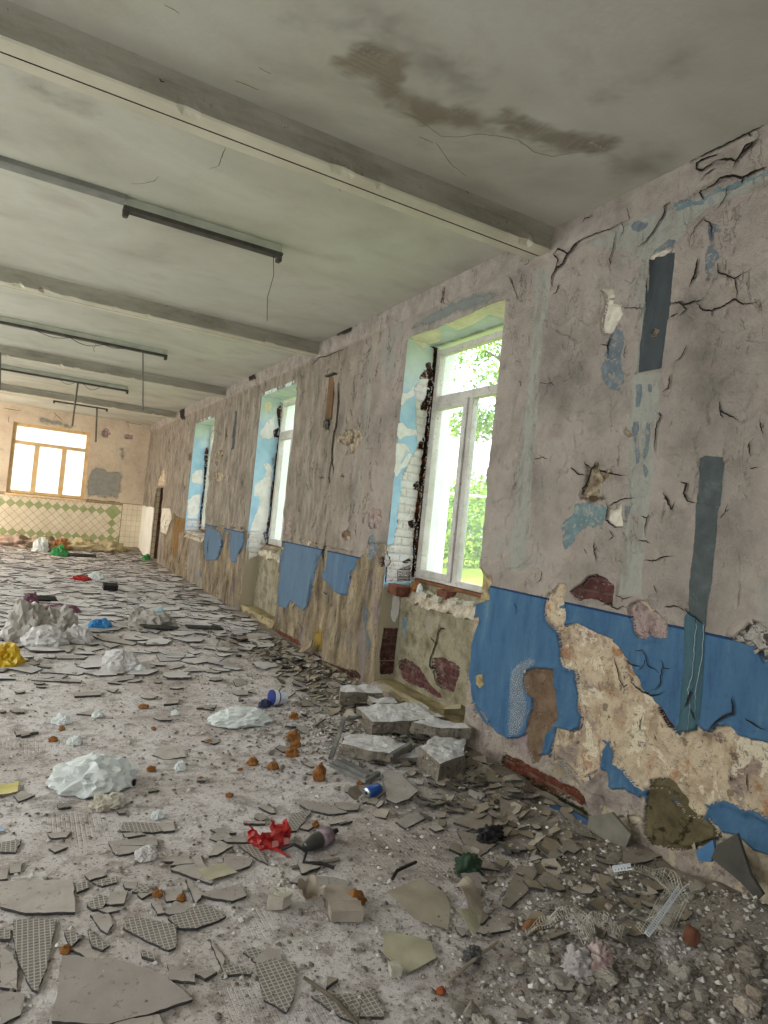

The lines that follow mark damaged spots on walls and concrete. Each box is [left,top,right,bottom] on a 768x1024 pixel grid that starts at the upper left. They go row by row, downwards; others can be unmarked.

crack [550,202,670,294]
crack [670,125,765,317]
flaking render [599,288,623,334]
crack [654,345,687,445]
crack [719,401,764,469]
crack [571,462,703,624]
peeling [160,362,768,904]
crack [614,650,762,730]